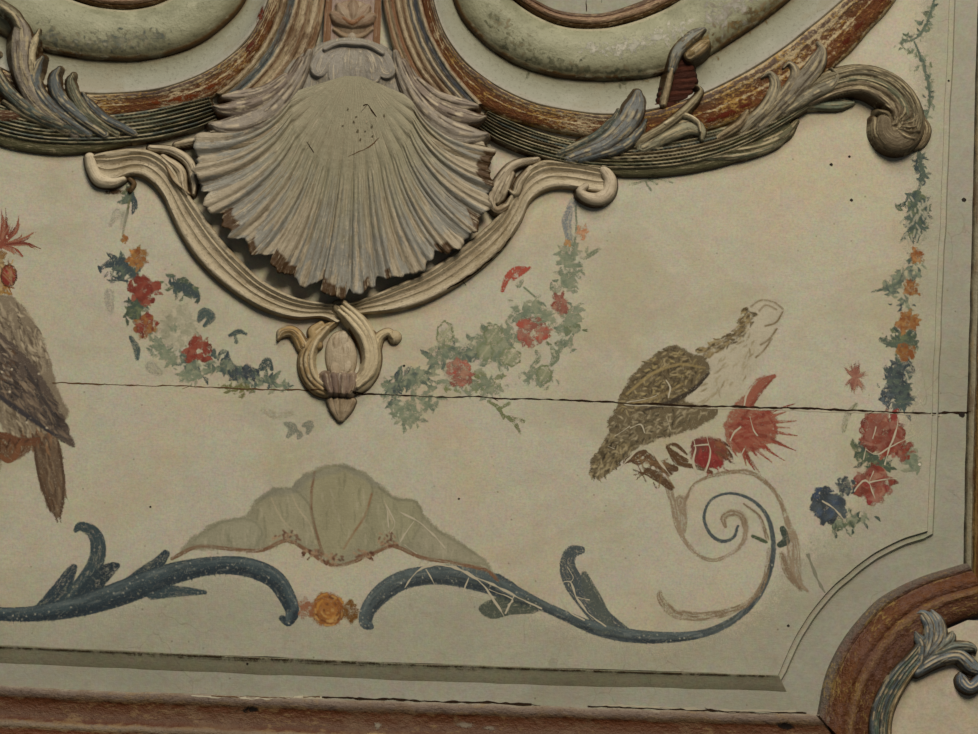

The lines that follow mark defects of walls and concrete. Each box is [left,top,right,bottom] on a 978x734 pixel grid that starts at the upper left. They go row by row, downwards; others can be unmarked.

crack [52,382,327,391]
crack [351,390,971,417]